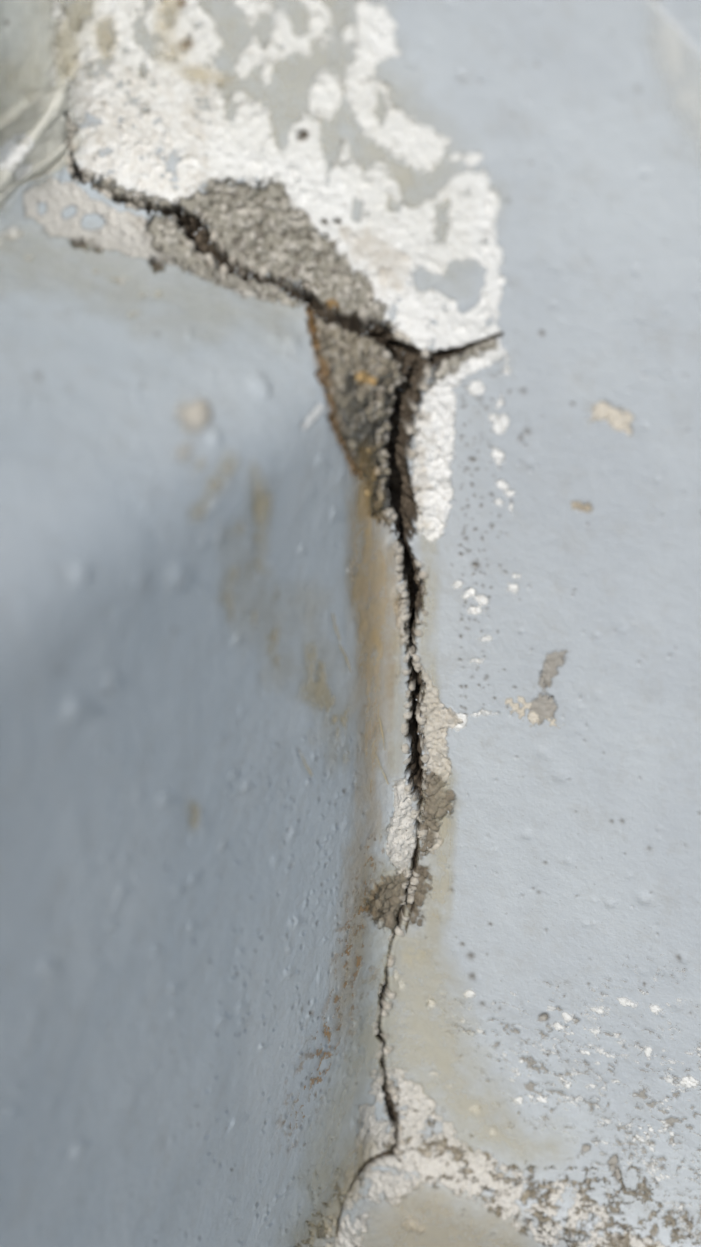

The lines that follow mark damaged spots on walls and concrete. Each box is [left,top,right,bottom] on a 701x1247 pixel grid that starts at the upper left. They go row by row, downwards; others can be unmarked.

peeling [0,0,511,543]
peeling [489,395,515,511]
crack [64,113,501,1237]
peeling [453,581,488,615]
peeling [295,982,701,1247]